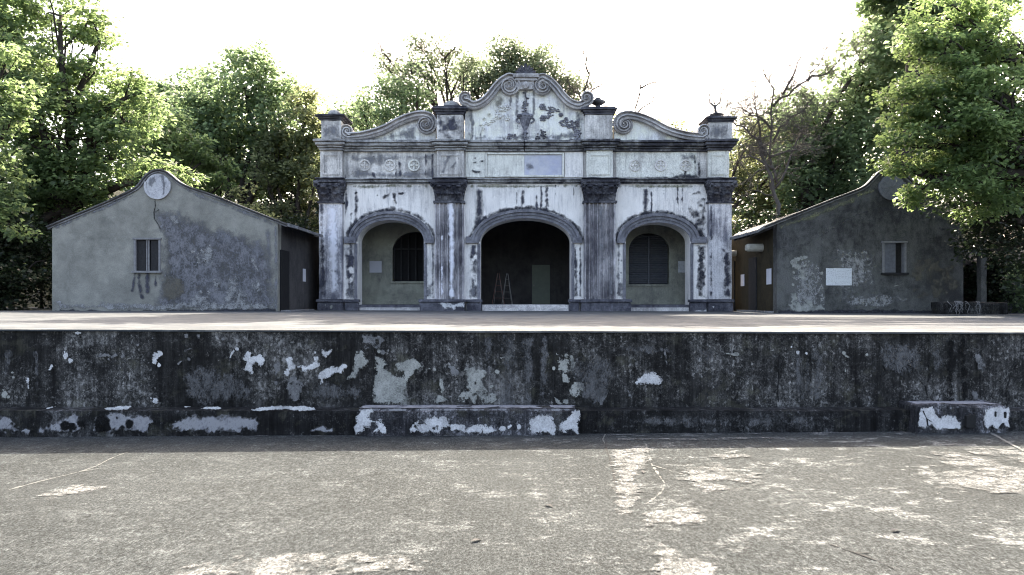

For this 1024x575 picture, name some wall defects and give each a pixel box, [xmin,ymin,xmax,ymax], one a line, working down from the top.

water stain [131,189,277,311]
water stain [345,154,456,298]
water stain [600,155,731,297]
peeling [788,255,826,312]
water stain [185,368,250,404]
peeling [230,335,607,435]
water stain [308,335,569,411]
water stain [572,359,613,401]
peeling [628,371,663,398]
water stain [882,344,919,374]
water stain [933,338,968,401]
peeling [918,390,1010,430]